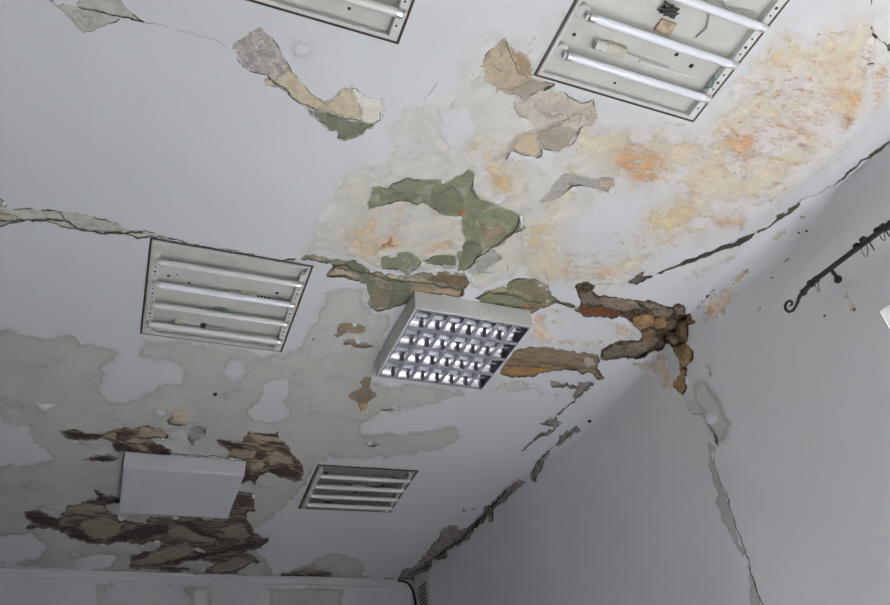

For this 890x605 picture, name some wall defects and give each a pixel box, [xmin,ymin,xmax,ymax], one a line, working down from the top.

peeling [50,0,144,33]
peeling [232,27,385,141]
leakage [314,78,585,286]
peeling [480,38,597,161]
leakage [645,83,815,244]
leakage [767,25,872,122]
peeling [293,169,695,400]
spalling [62,409,206,463]
spalling [25,431,304,574]
spalling [398,416,581,581]